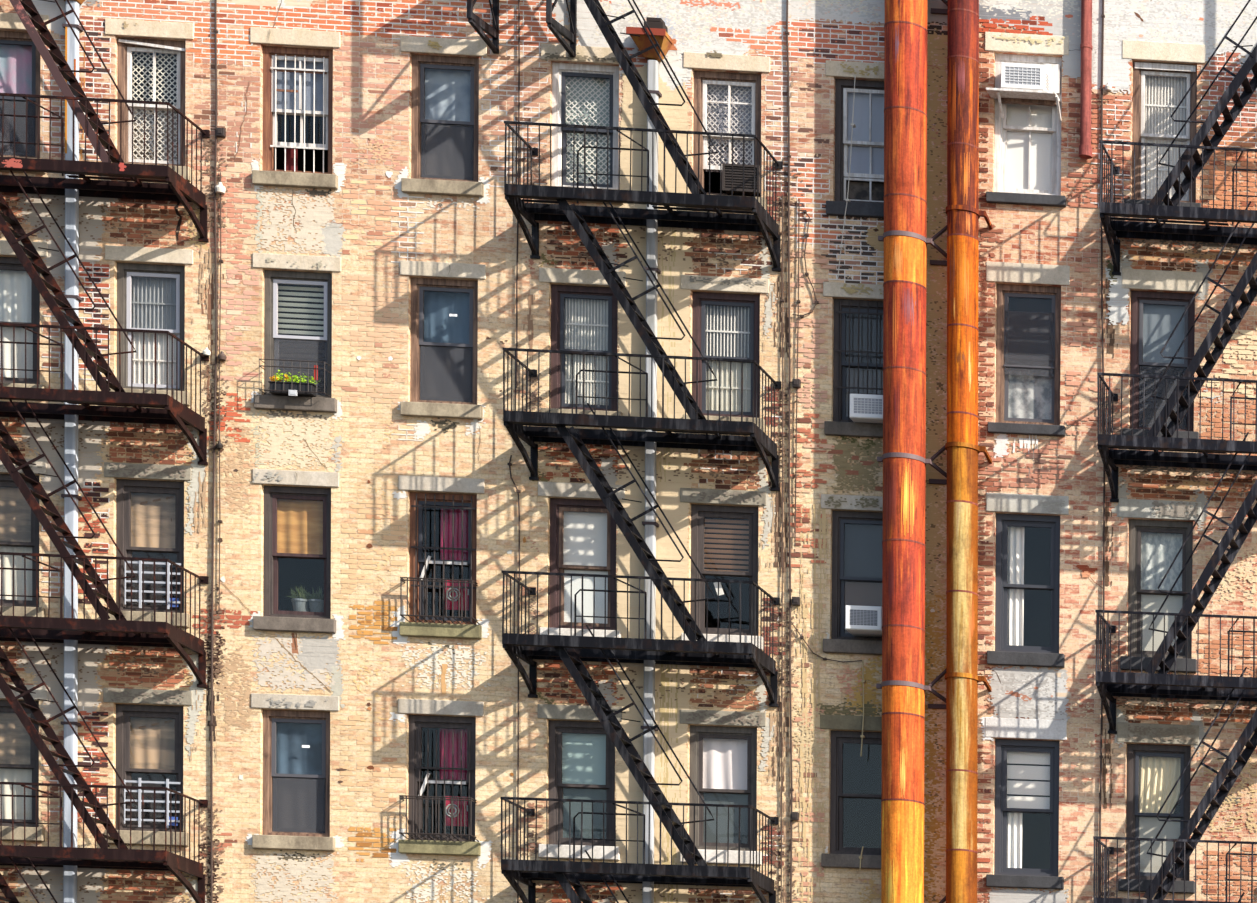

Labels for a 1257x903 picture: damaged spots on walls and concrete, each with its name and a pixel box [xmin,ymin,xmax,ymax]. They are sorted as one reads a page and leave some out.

flaking render [979,14,1073,207]
flaking render [1067,78,1131,208]
flaking render [787,504,827,567]
flaking render [978,224,1128,715]